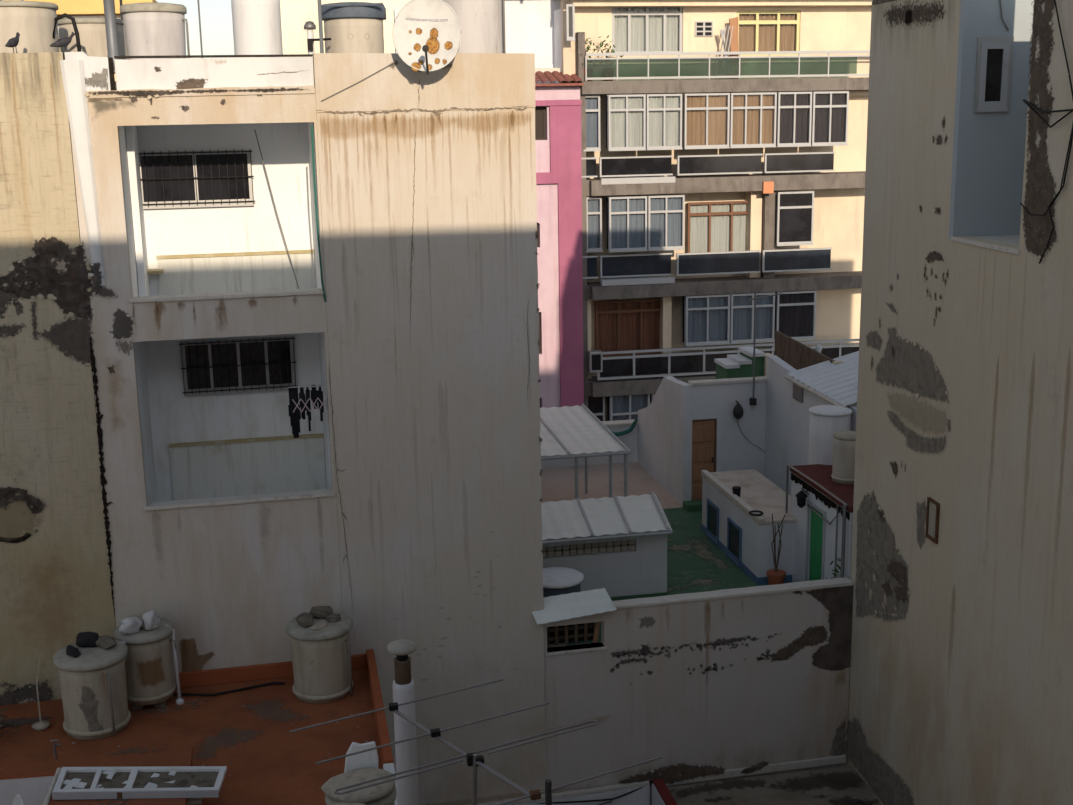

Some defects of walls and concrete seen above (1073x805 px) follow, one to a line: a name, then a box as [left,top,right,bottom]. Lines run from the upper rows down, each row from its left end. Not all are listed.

flaking render [1022,0,1057,259]
crack [317,79,529,334]
flaking render [0,237,134,367]
flaking render [867,319,948,402]
crack [90,337,115,617]
flaking render [791,472,911,622]
flaking render [611,625,828,685]
flaking render [830,717,915,805]